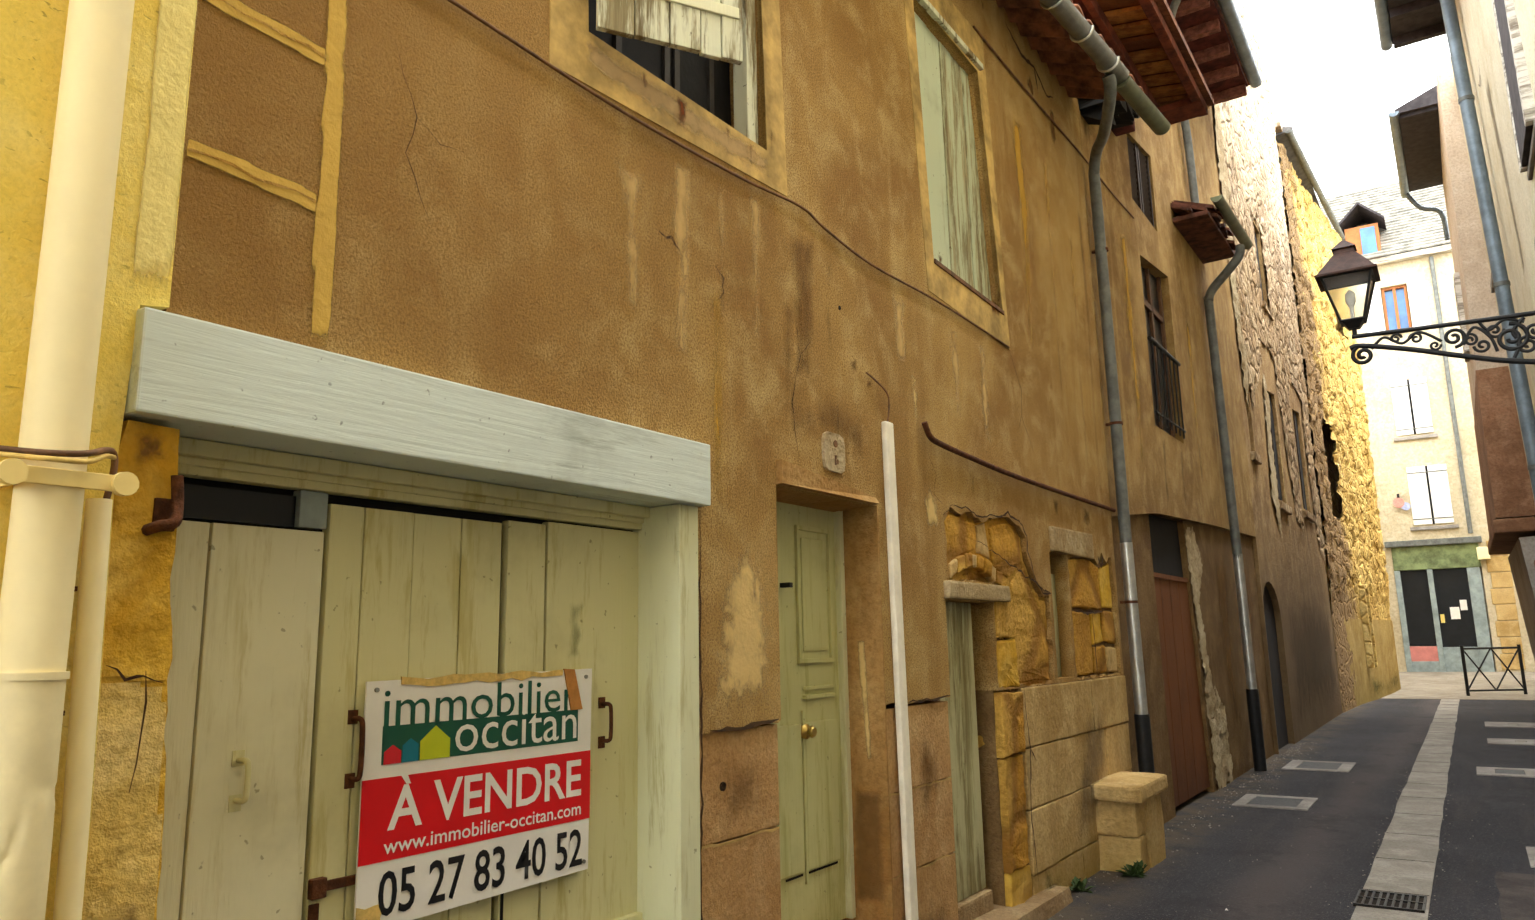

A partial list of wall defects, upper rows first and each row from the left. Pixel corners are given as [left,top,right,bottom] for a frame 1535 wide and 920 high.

crack [397,49,462,224]
crack [106,665,163,792]
peeling [720,556,767,696]
spalling [944,505,1051,907]
spalling [1068,556,1117,677]
peeling [1185,526,1233,790]